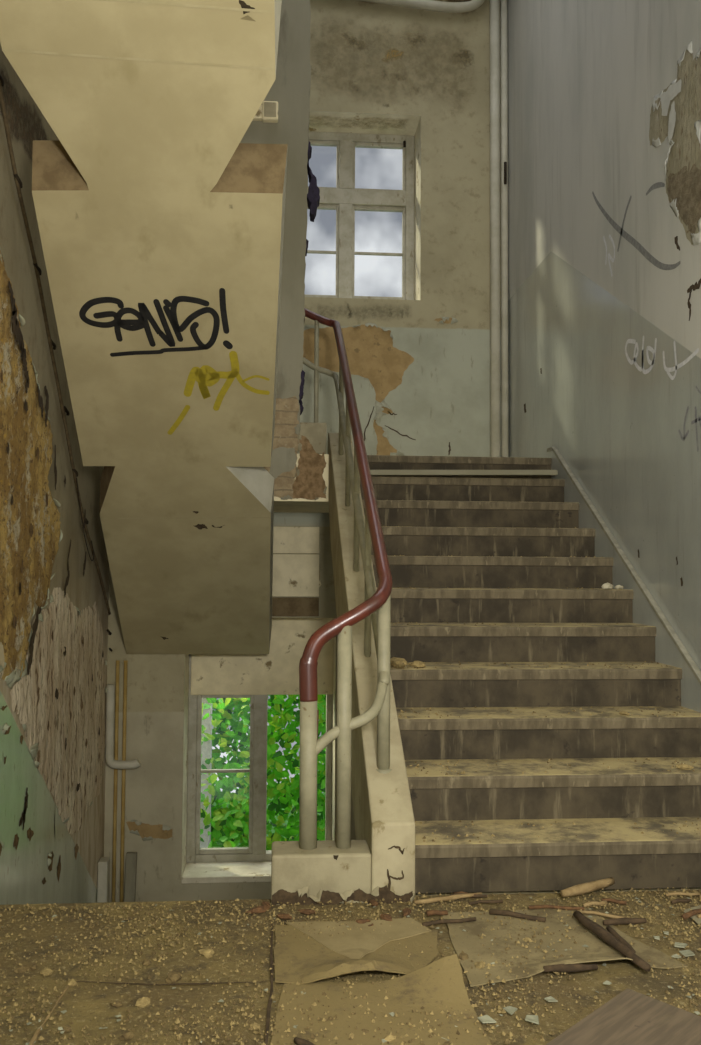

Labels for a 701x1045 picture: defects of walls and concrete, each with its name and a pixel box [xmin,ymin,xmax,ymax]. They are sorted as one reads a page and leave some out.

peeling [649,40,701,251]
peeling [264,323,416,500]
flaking render [0,247,108,859]
spalling [42,851,61,884]